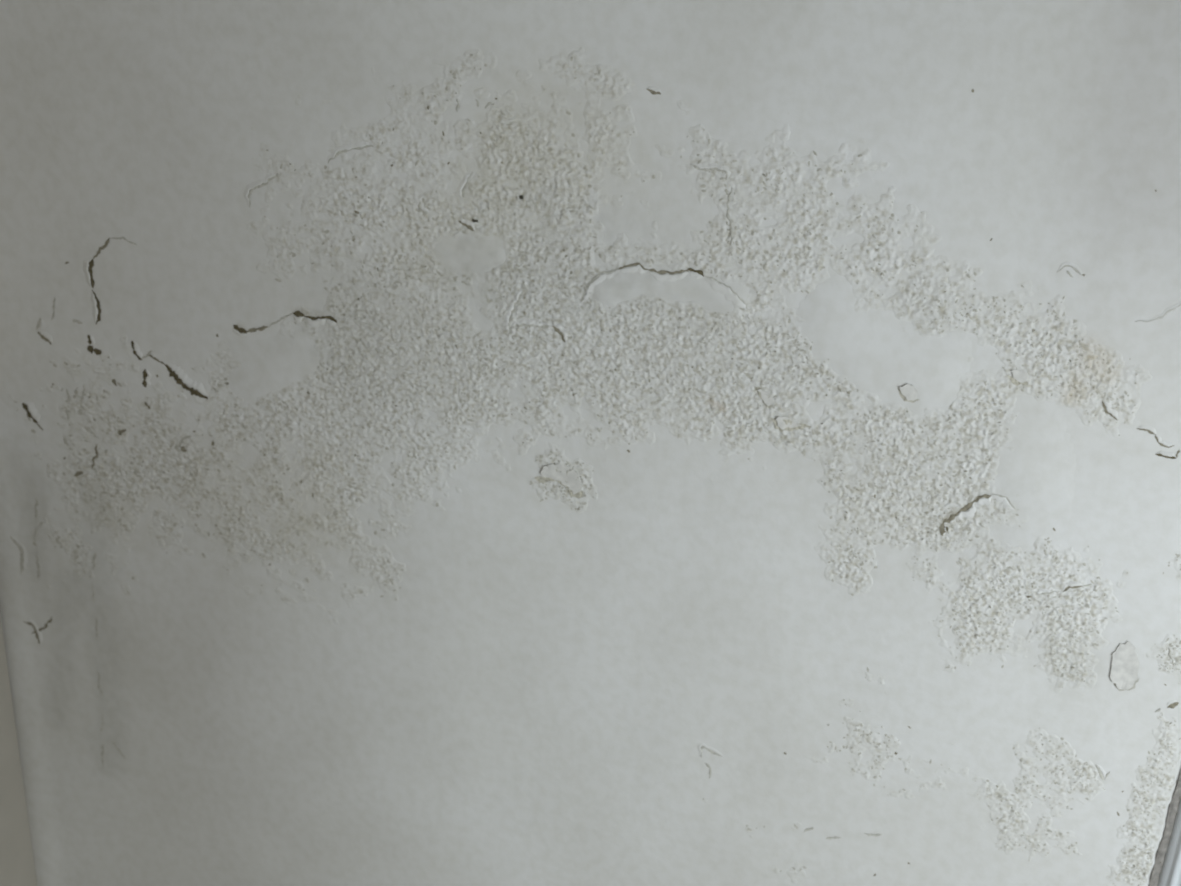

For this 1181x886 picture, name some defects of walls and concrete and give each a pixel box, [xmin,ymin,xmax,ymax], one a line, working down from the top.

crack [216,298,360,337]
crack [504,285,568,342]
crack [580,263,748,310]
crack [22,237,214,477]
crack [1102,401,1180,459]
crack [940,494,1016,536]